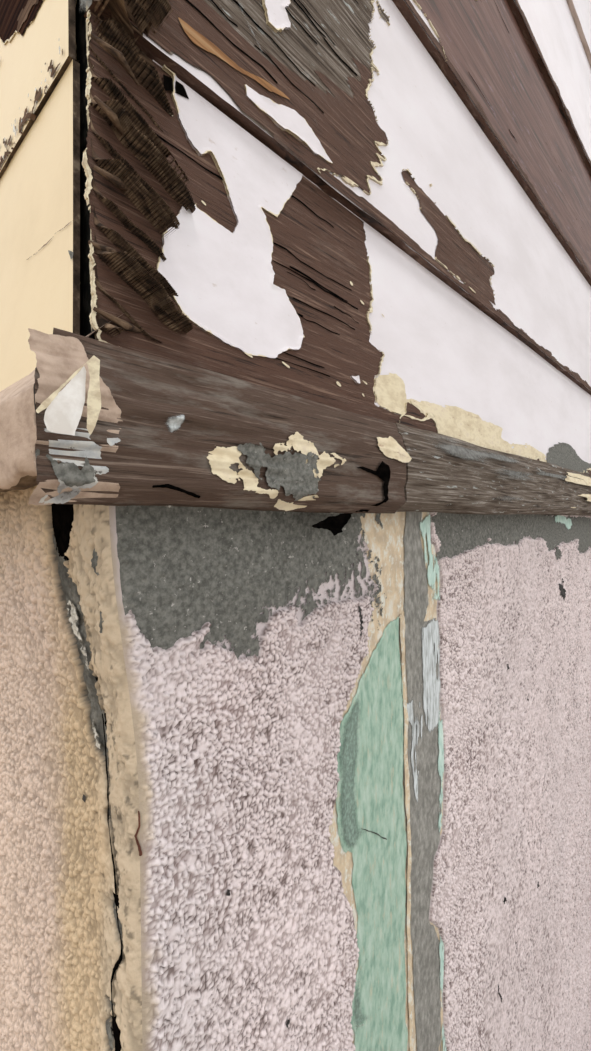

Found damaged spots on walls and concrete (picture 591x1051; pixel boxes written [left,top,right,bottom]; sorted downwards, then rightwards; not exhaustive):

peeling [0,0,44,45]
peeling [82,0,591,502]
crack [51,503,74,561]
crack [97,676,123,1051]
flaking render [28,328,591,1051]